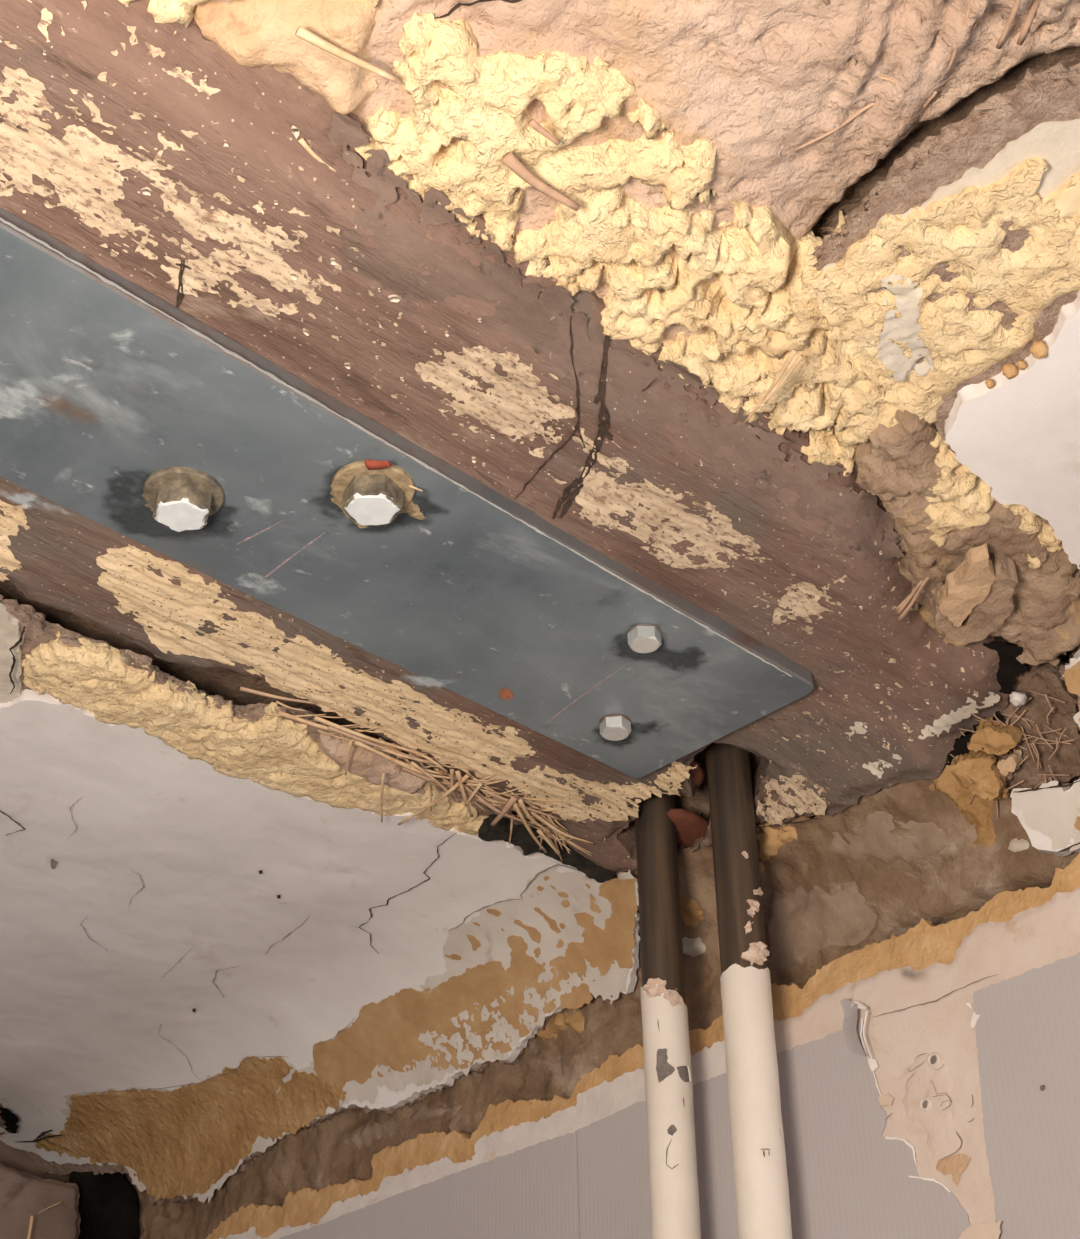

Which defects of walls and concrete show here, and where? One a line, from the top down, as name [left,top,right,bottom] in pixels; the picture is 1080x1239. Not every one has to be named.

crack [435,0,522,19]
peeling [0,66,323,319]
crack [514,316,613,519]
flaking render [355,0,1080,796]
crack [9,627,26,694]
peeling [21,544,697,835]
peeling [35,864,638,1199]
crack [348,833,456,954]
flaking render [205,1015,725,1239]
peeling [741,887,770,966]
peeling [756,775,827,826]
flaking render [771,853,1080,1021]